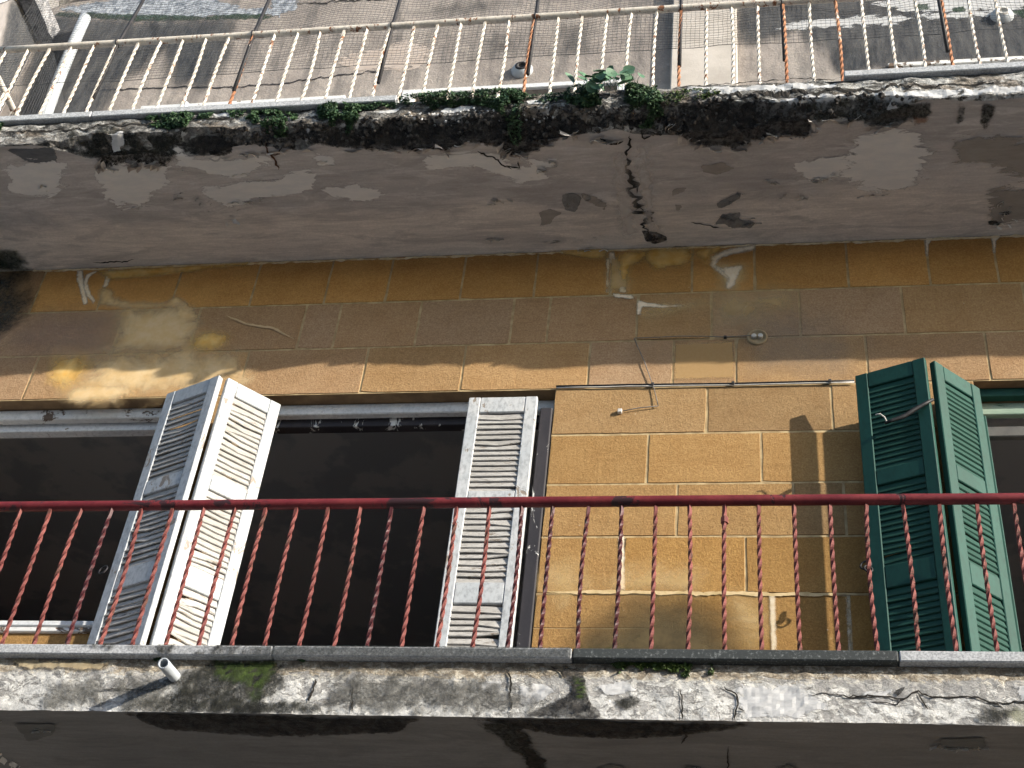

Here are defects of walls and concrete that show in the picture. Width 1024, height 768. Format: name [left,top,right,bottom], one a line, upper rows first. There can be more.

peeling [0,158,70,199]
spalling [70,82,1024,212]
crack [600,130,654,231]
spalling [714,192,762,228]
leakage [606,234,1024,314]
leakage [0,251,567,400]
leakage [547,537,861,650]
leakage [126,667,417,737]
crack [507,670,547,768]
crack [808,690,1024,709]